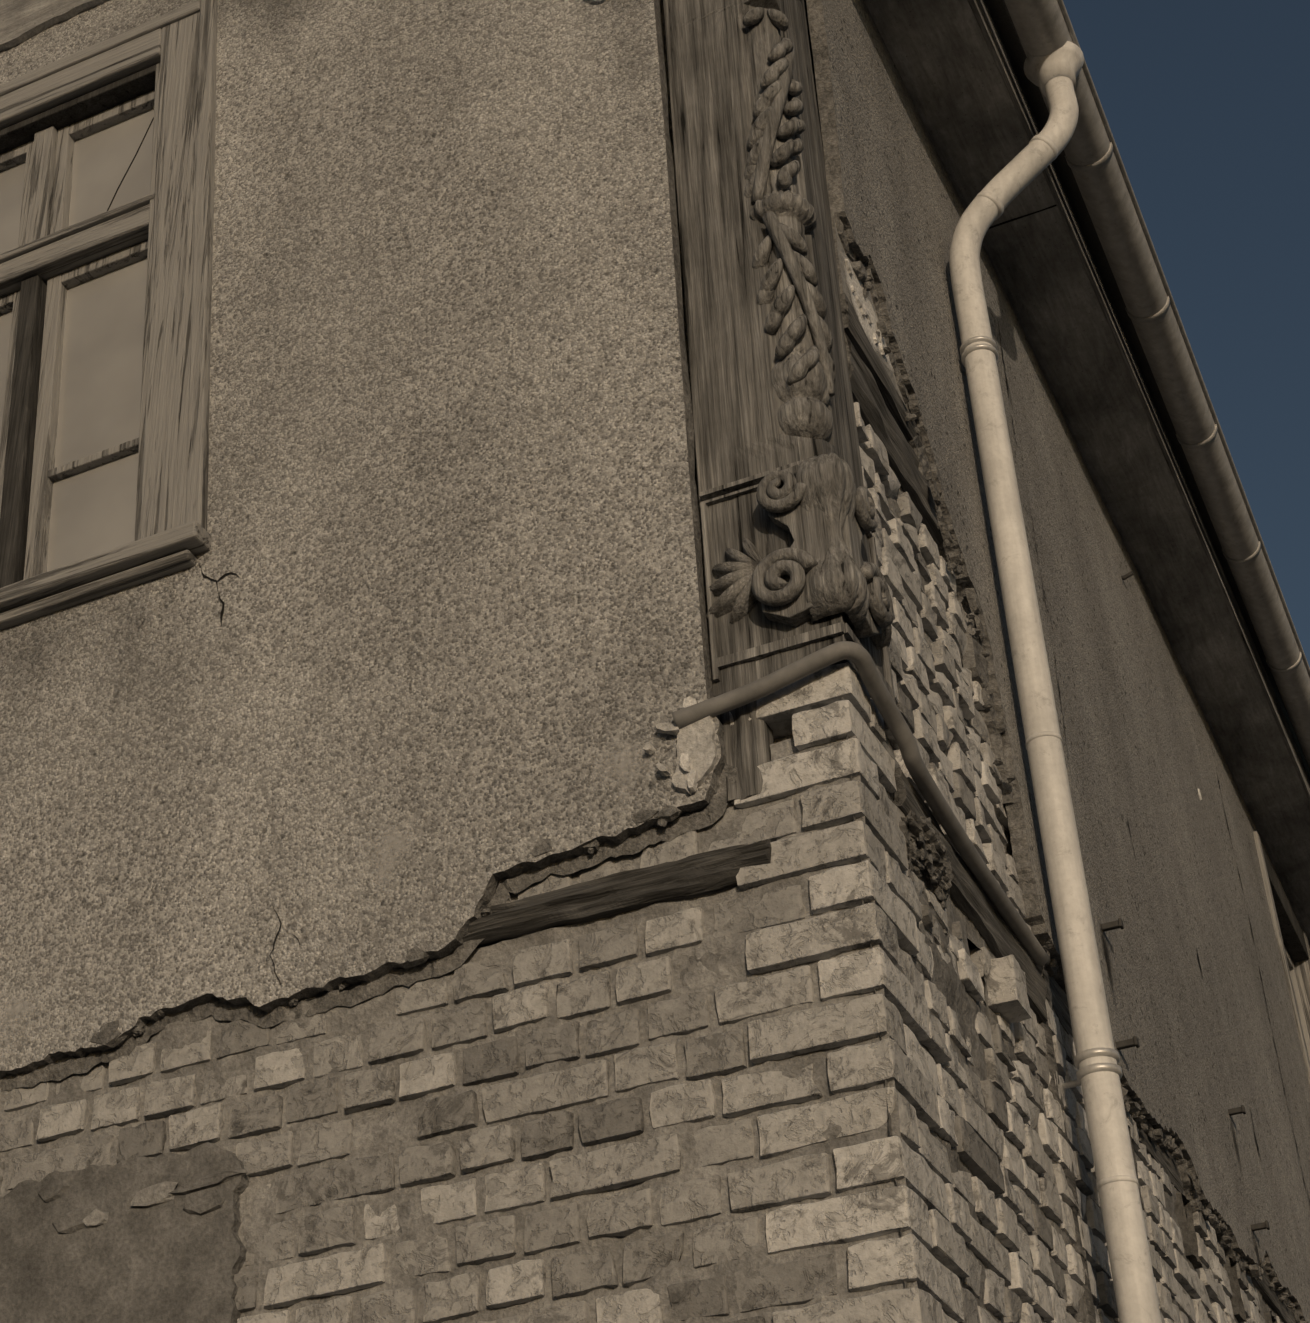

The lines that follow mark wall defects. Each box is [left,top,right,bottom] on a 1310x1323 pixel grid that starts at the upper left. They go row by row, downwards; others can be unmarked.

crack [998,323,1017,445]
spalling [831,213,1016,804]
crack [199,565,240,626]
spalling [481,692,737,917]
spalling [899,810,965,961]
spalling [0,933,485,1092]
spalling [1045,951,1067,995]
spalling [1120,1082,1309,1323]